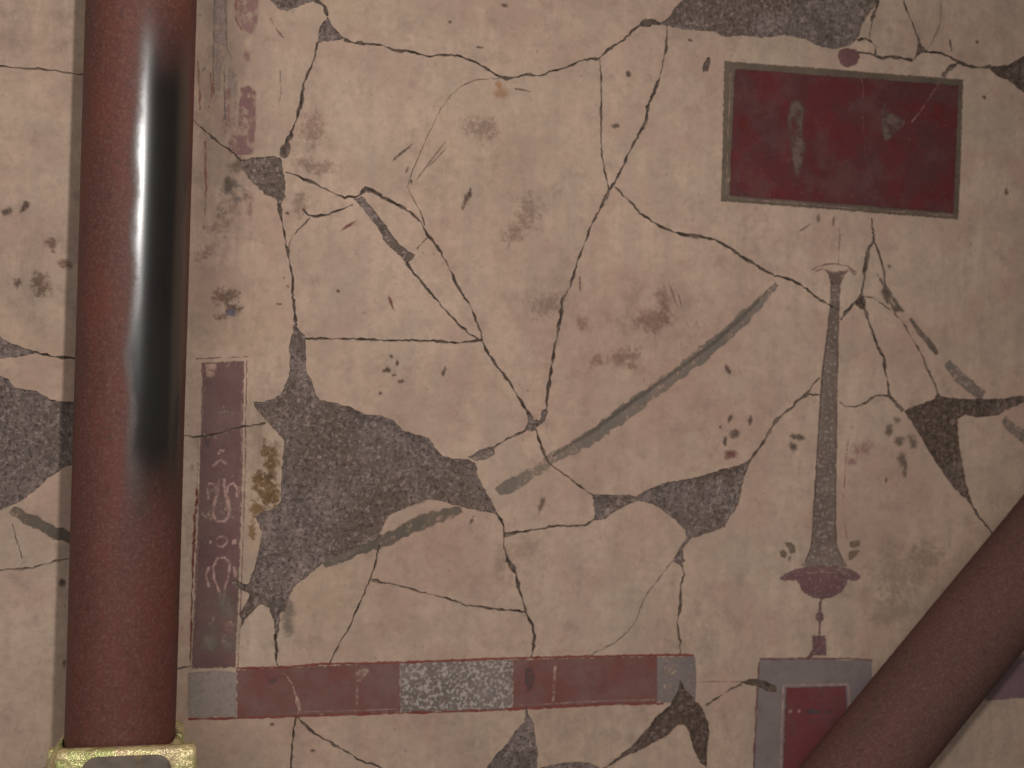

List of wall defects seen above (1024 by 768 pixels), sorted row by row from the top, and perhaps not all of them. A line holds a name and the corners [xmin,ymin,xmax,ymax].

crack [314,0,329,16]
flaking render [659,0,877,49]
crack [857,0,991,122]
crack [193,120,241,161]
crack [277,19,938,663]
flaking render [0,376,74,510]
crack [184,422,266,438]
flaking render [230,321,497,635]
flaking render [593,462,748,565]
flaking render [904,393,1024,504]
crack [274,633,382,768]
flaking render [487,681,709,768]